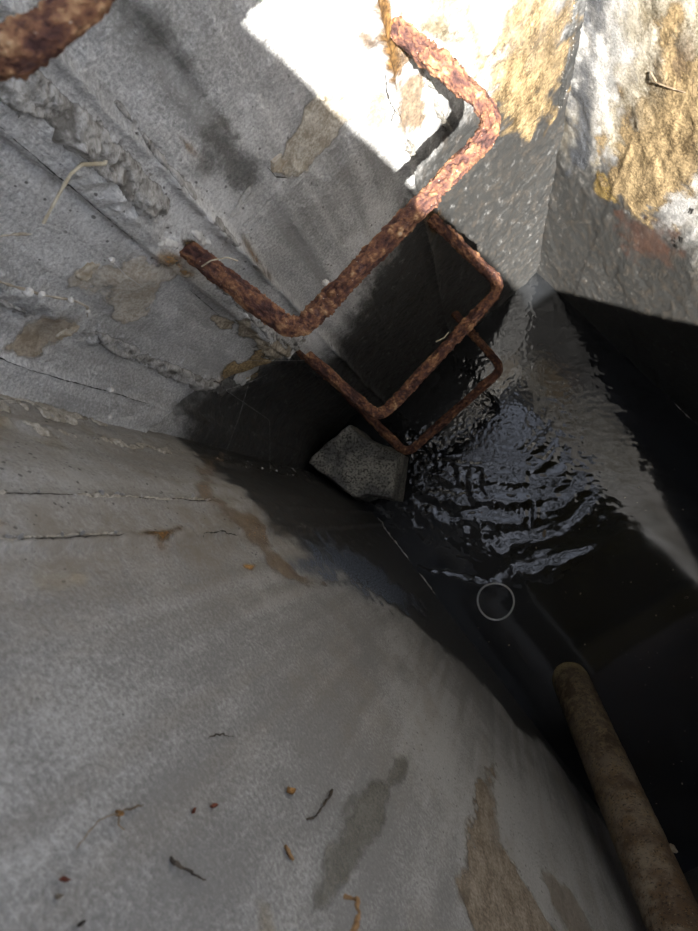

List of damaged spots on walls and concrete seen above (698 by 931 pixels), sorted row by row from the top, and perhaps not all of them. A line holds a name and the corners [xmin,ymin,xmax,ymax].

crack [1,116,134,240]
rust [363,0,426,132]
leakage [420,0,698,225]
crack [6,490,73,498]
crack [21,532,125,540]
leakage [455,765,555,931]